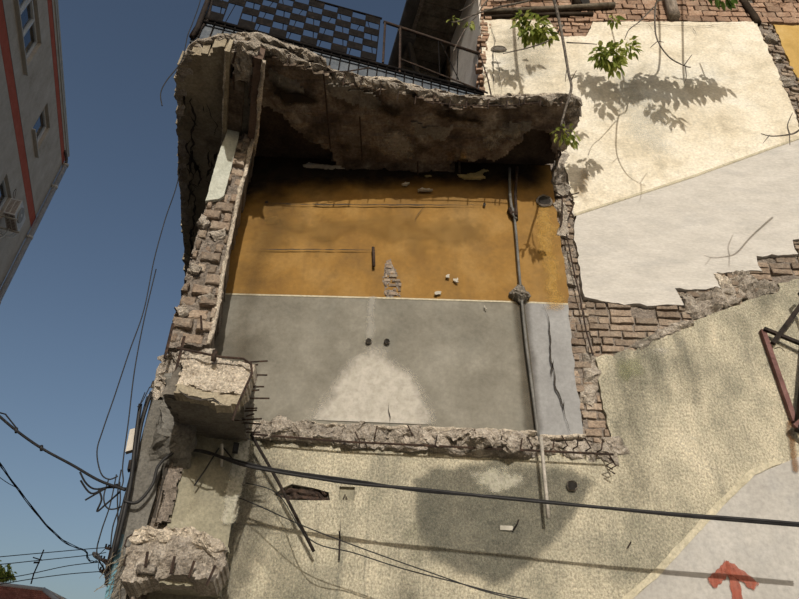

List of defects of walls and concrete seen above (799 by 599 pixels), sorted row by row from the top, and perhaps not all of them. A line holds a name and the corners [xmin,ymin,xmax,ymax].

crack [183,96,218,253]
peeling [303,162,345,170]
peeling [457,169,489,180]
spalling [176,347,503,450]
flaking render [382,259,402,297]
crack [543,305,570,430]
flaking render [520,151,630,474]
damp [418,464,589,580]